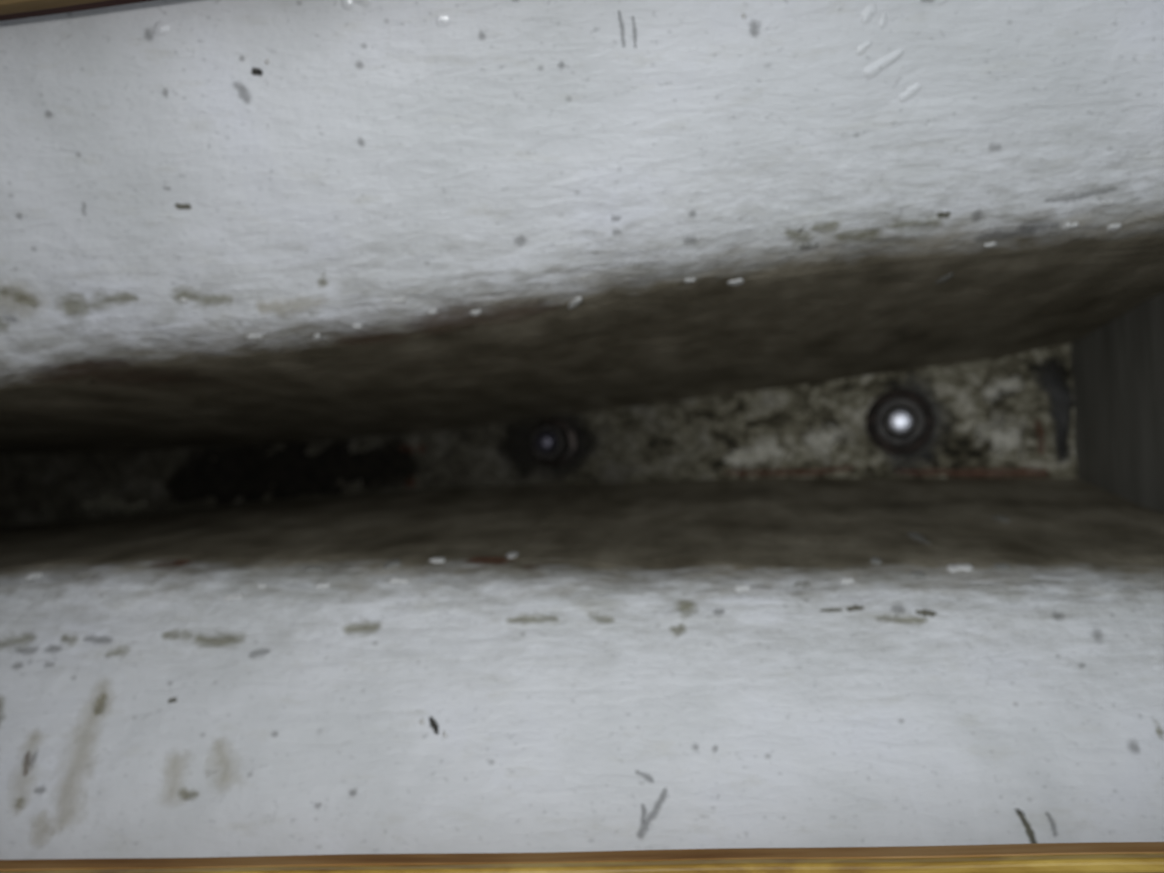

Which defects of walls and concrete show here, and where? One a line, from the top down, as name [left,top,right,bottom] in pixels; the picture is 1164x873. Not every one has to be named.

water stain [985,377,1023,401]
water stain [974,413,1024,457]